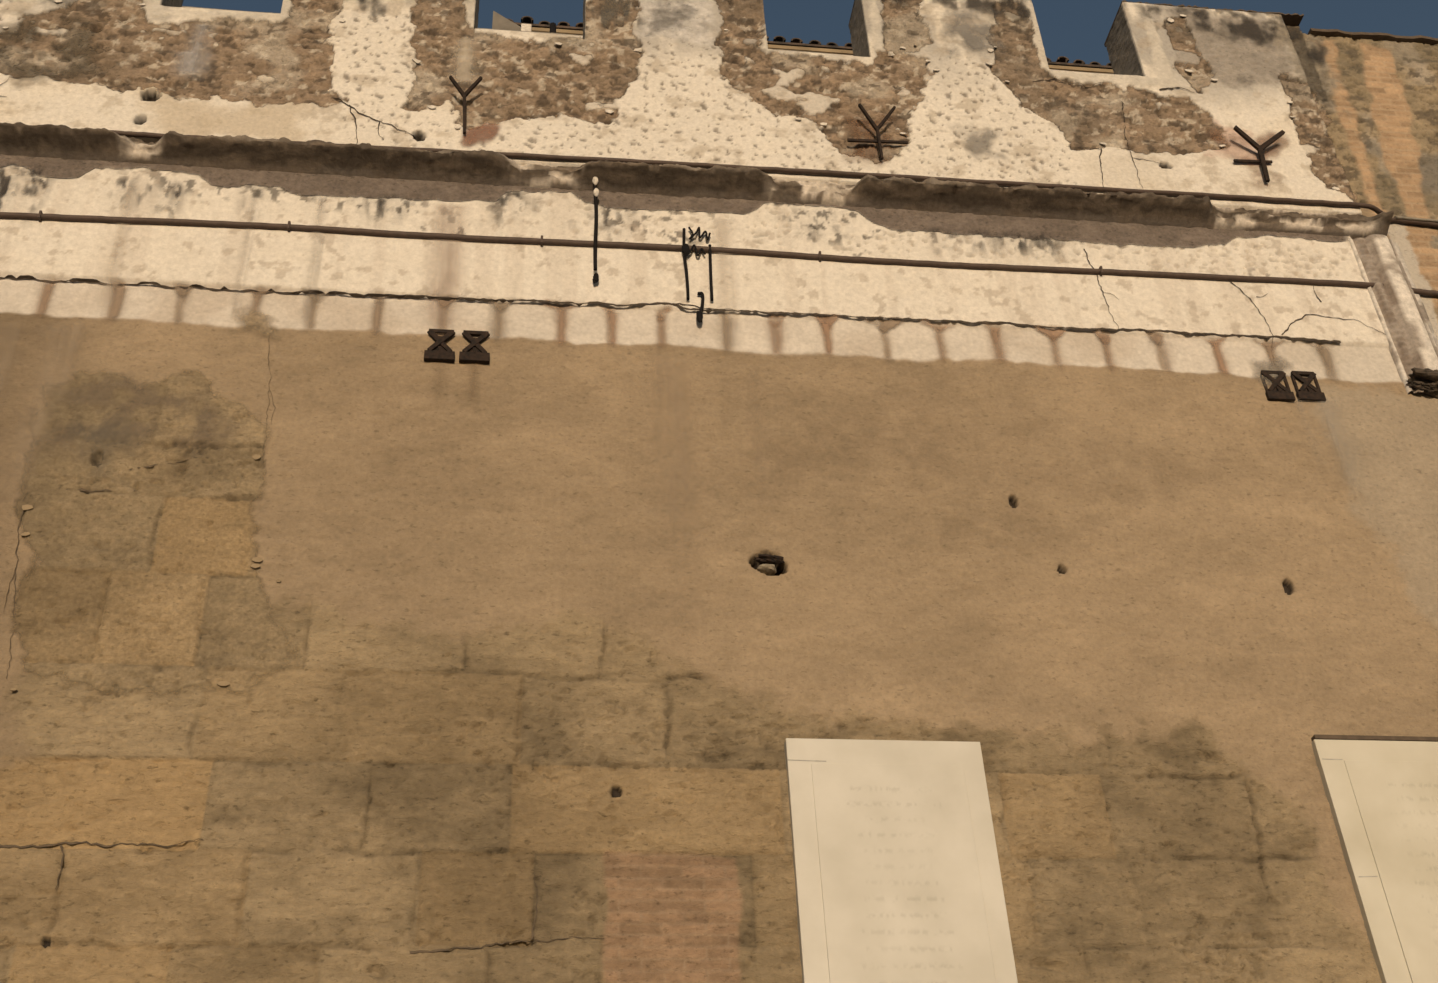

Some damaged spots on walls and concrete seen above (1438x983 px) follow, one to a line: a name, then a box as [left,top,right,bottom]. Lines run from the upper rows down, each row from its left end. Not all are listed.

spalling [0,0,349,108]
spalling [402,0,644,130]
spalling [714,0,940,164]
spalling [986,1,1230,155]
leakage [0,173,10,205]
leakage [25,170,47,194]
spalling [1278,73,1357,202]
rust [109,282,126,319]
rust [546,302,574,343]
crack [0,249,1386,359]
rust [816,316,837,352]
rust [868,319,901,332]